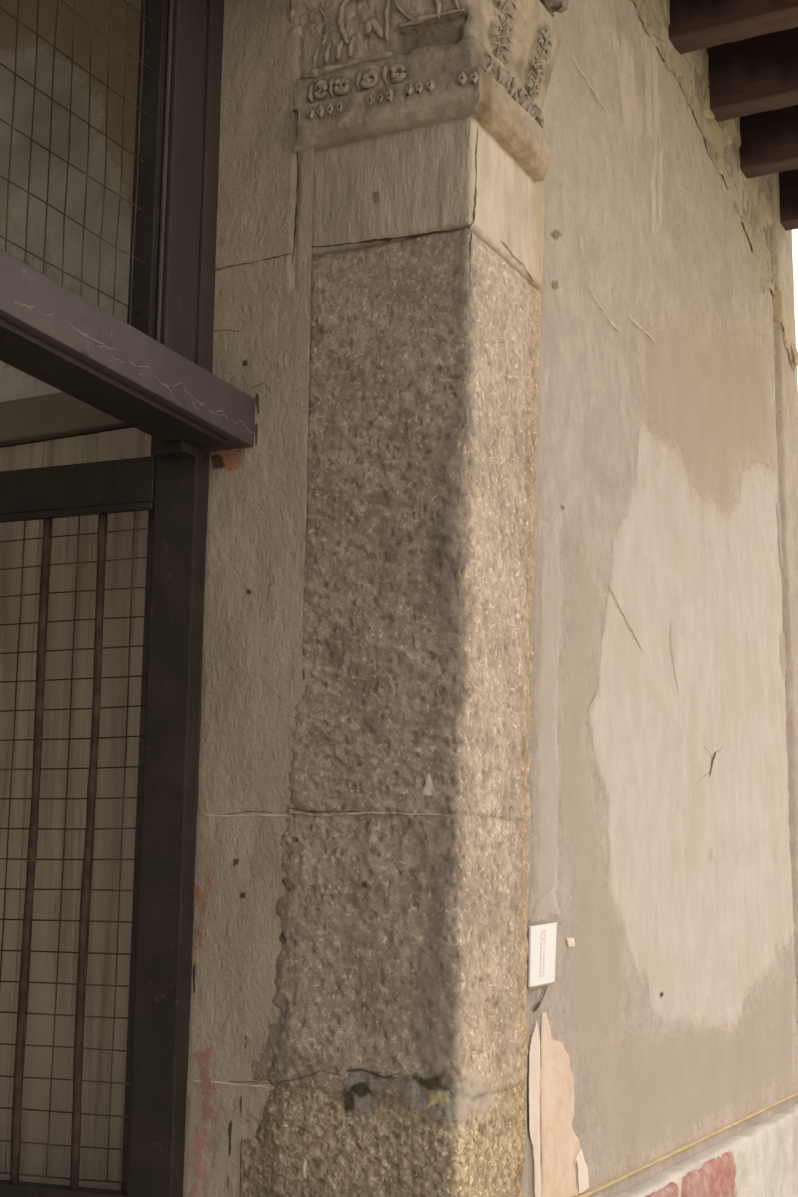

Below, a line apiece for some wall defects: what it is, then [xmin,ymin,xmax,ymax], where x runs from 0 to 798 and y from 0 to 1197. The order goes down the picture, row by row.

crack [204,808,444,817]
flaking render [589,425,796,1030]
flaking render [529,985,589,1197]